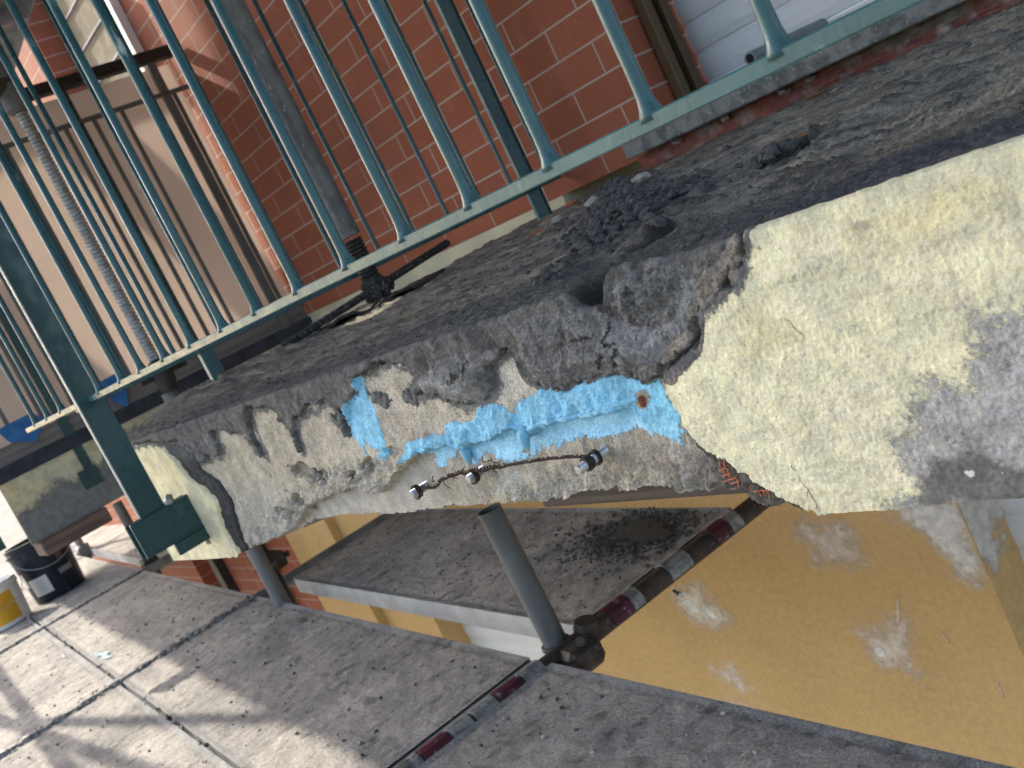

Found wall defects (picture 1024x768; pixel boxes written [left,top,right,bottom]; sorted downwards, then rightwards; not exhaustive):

spalling [653,233,746,388]
spalling [163,351,804,553]
corrosion [635,390,650,409]